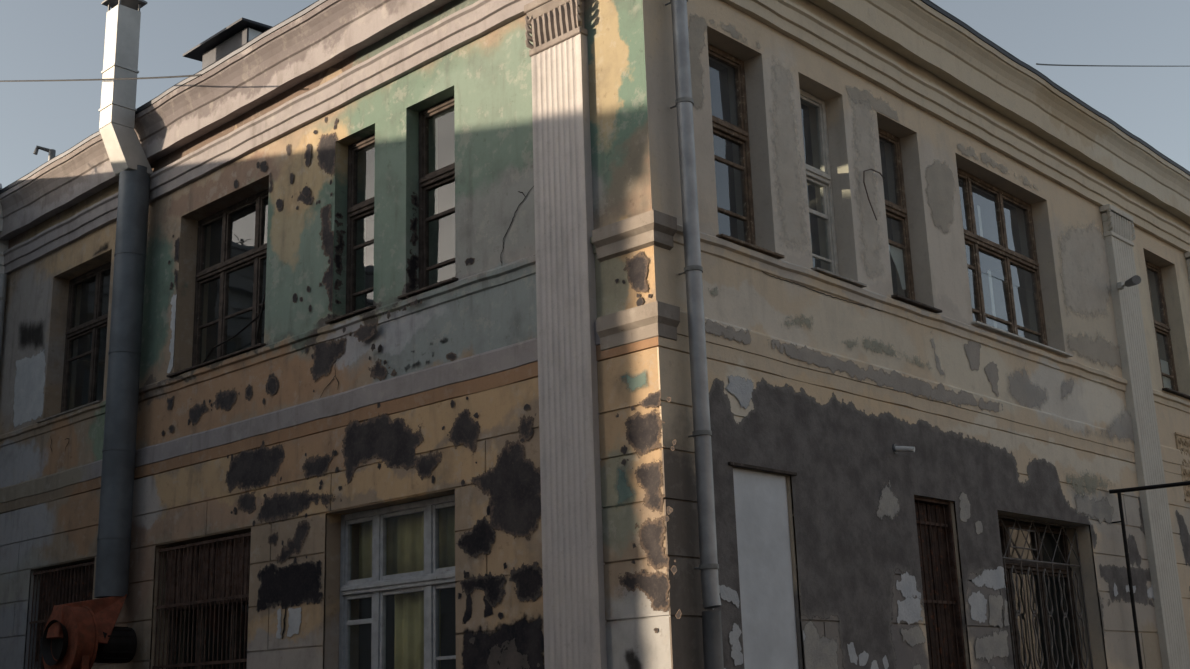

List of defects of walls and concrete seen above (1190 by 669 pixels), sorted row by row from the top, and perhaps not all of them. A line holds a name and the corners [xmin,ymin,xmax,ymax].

flaking render [256,117,346,320]
crack [500,186,534,263]
flaking render [305,192,422,392]
flaking render [225,396,543,619]
flaking render [616,390,682,619]
peeling [877,480,900,520]
peeling [959,492,983,535]
peeling [487,638,540,669]
peeling [724,623,743,669]
peeling [803,621,889,669]
peeling [896,571,925,647]
peeling [968,566,1010,669]